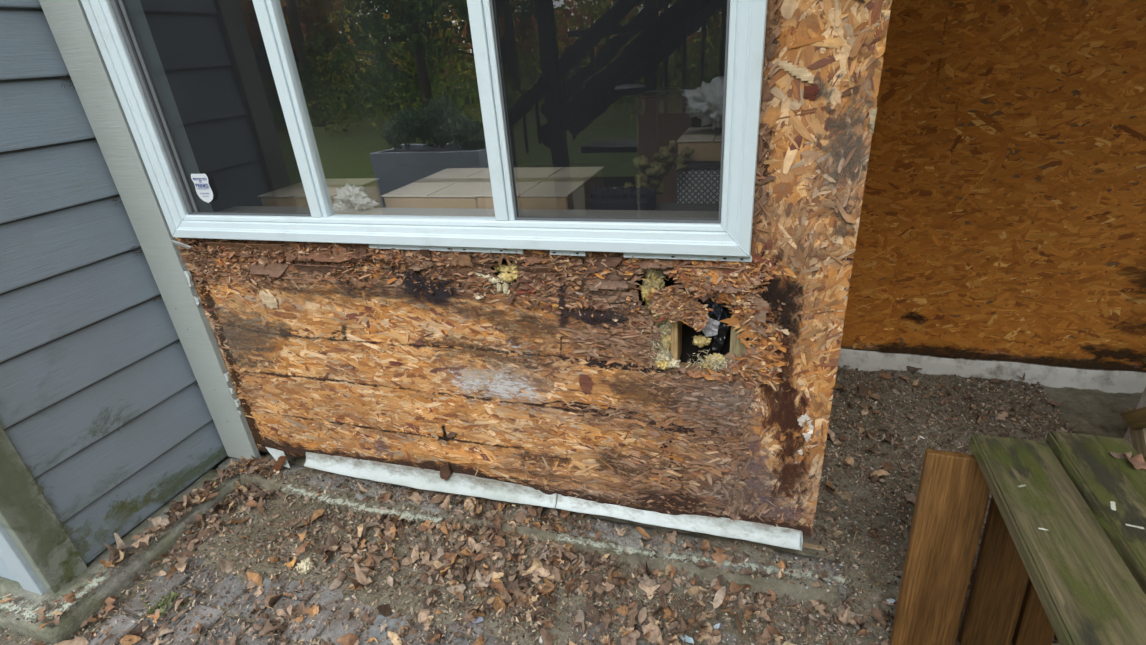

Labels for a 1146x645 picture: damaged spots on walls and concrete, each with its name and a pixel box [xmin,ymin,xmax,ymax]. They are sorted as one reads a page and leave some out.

leakage [183,241,292,448]
leakage [283,259,704,437]
peeling [491,252,555,304]
spalling [581,255,769,376]
leakage [753,251,803,343]
leakage [424,460,513,483]
leakage [513,433,806,525]